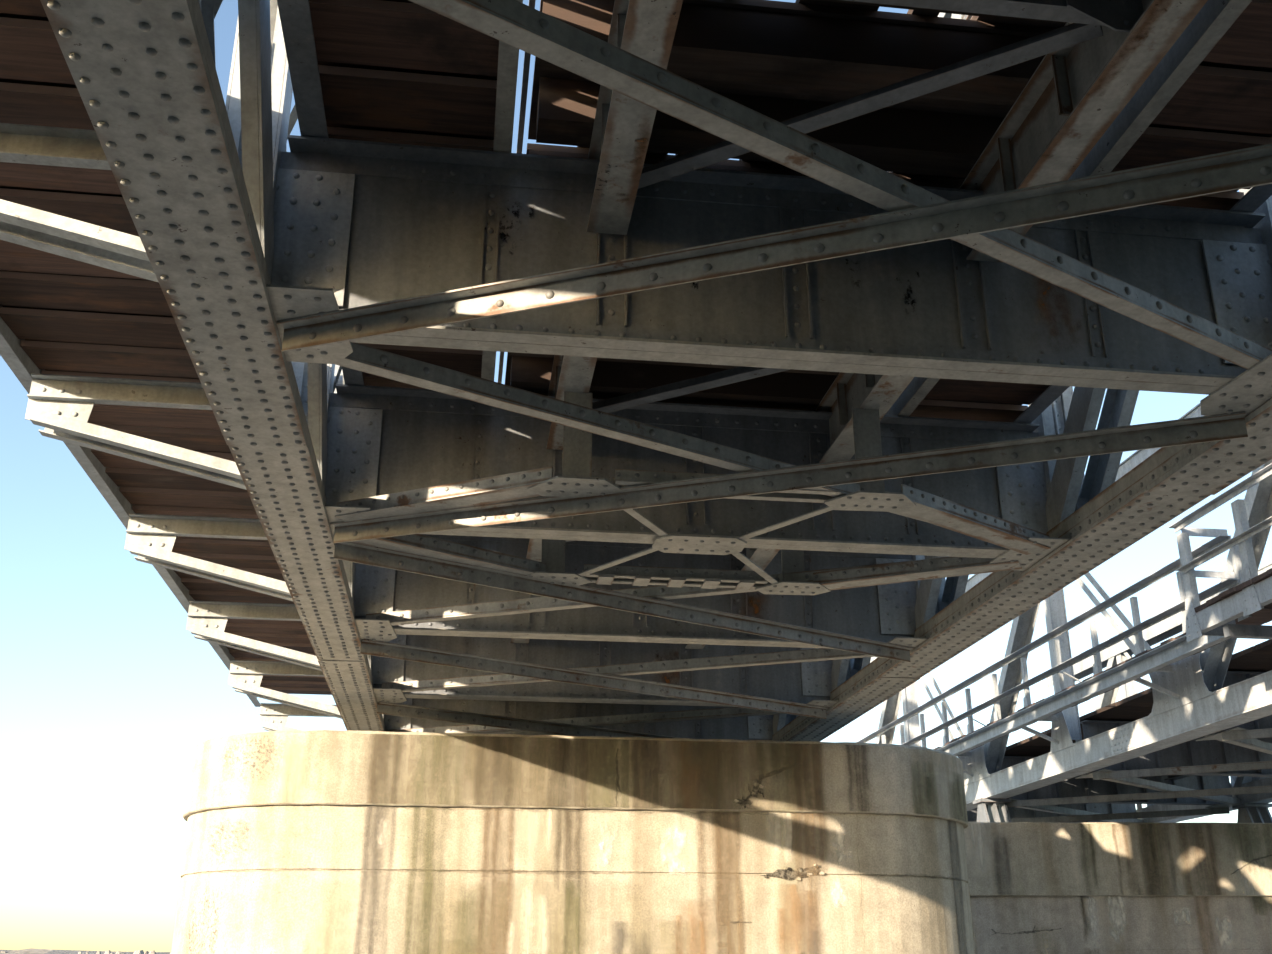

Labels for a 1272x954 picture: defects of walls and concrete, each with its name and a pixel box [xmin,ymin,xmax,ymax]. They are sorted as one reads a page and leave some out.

water stain [485,736,545,950]
water stain [548,738,584,953]